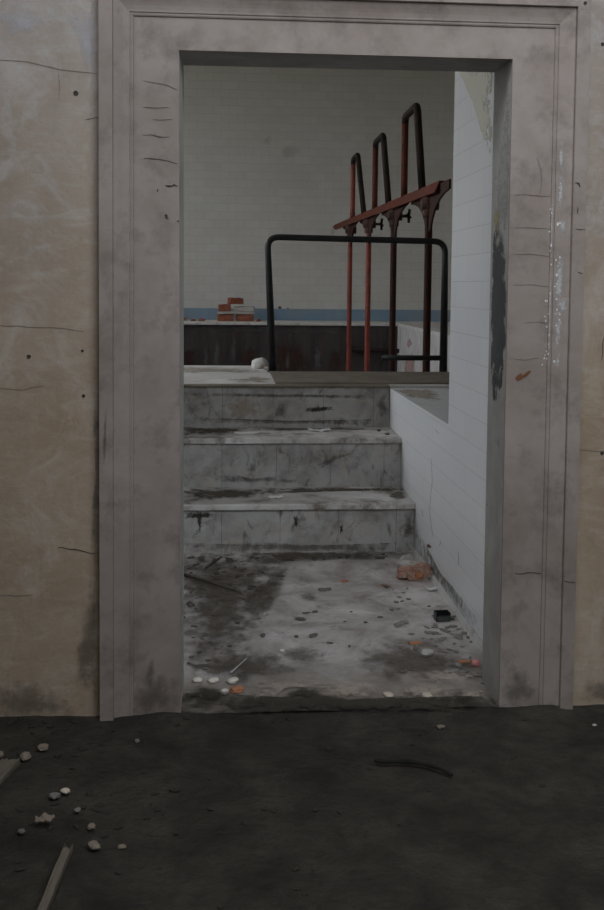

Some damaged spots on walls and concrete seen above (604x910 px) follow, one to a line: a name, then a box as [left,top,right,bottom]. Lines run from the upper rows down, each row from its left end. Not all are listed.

crack [2,60,96,99]